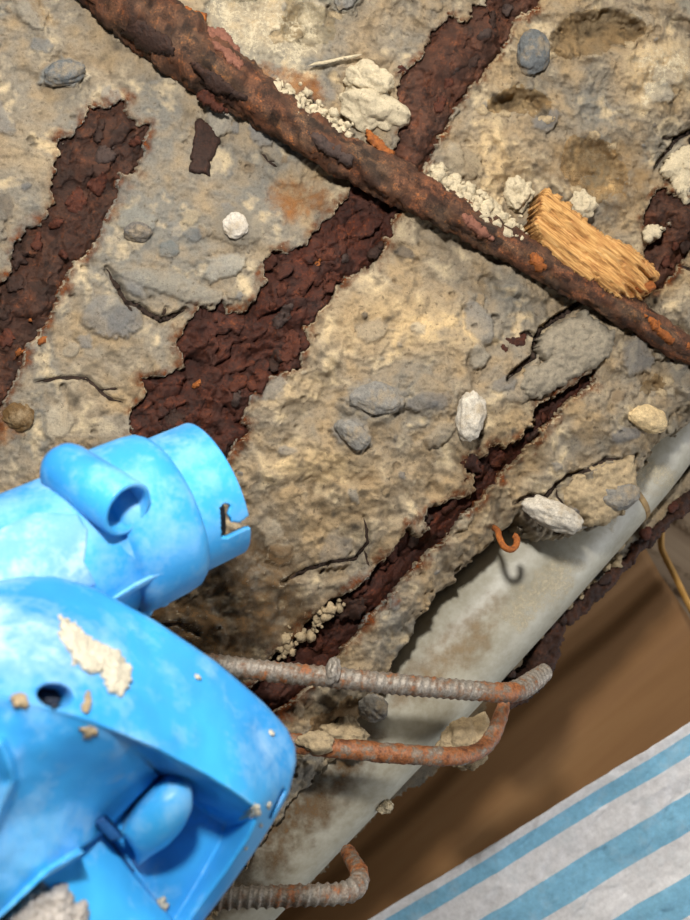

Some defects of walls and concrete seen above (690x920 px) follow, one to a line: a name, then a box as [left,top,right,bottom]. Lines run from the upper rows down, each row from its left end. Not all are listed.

rust [0,92,153,406]
rust [79,0,690,464]
crack [106,268,185,323]
crack [37,376,122,402]
crack [515,457,619,504]
crack [282,518,370,583]
rust [269,373,596,666]
rust [244,680,315,720]
spalling [203,652,553,767]
spalling [210,844,370,912]